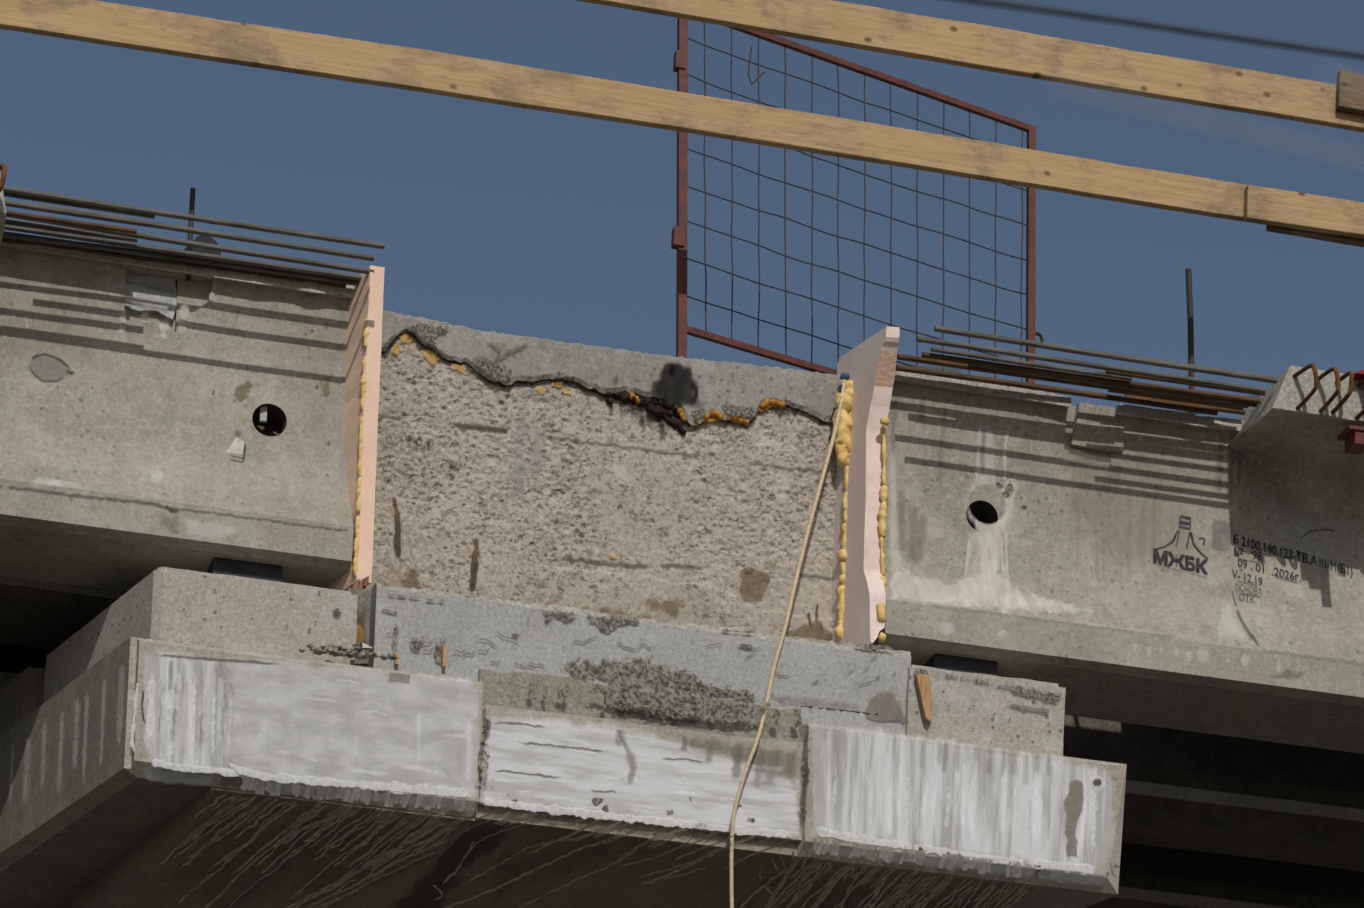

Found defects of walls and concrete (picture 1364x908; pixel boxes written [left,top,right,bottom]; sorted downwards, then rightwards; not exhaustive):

crack [381,331,833,457]
damp [660,363,698,402]
crack [754,462,830,472]
damp [891,431,1079,613]
damp [10,653,1112,908]